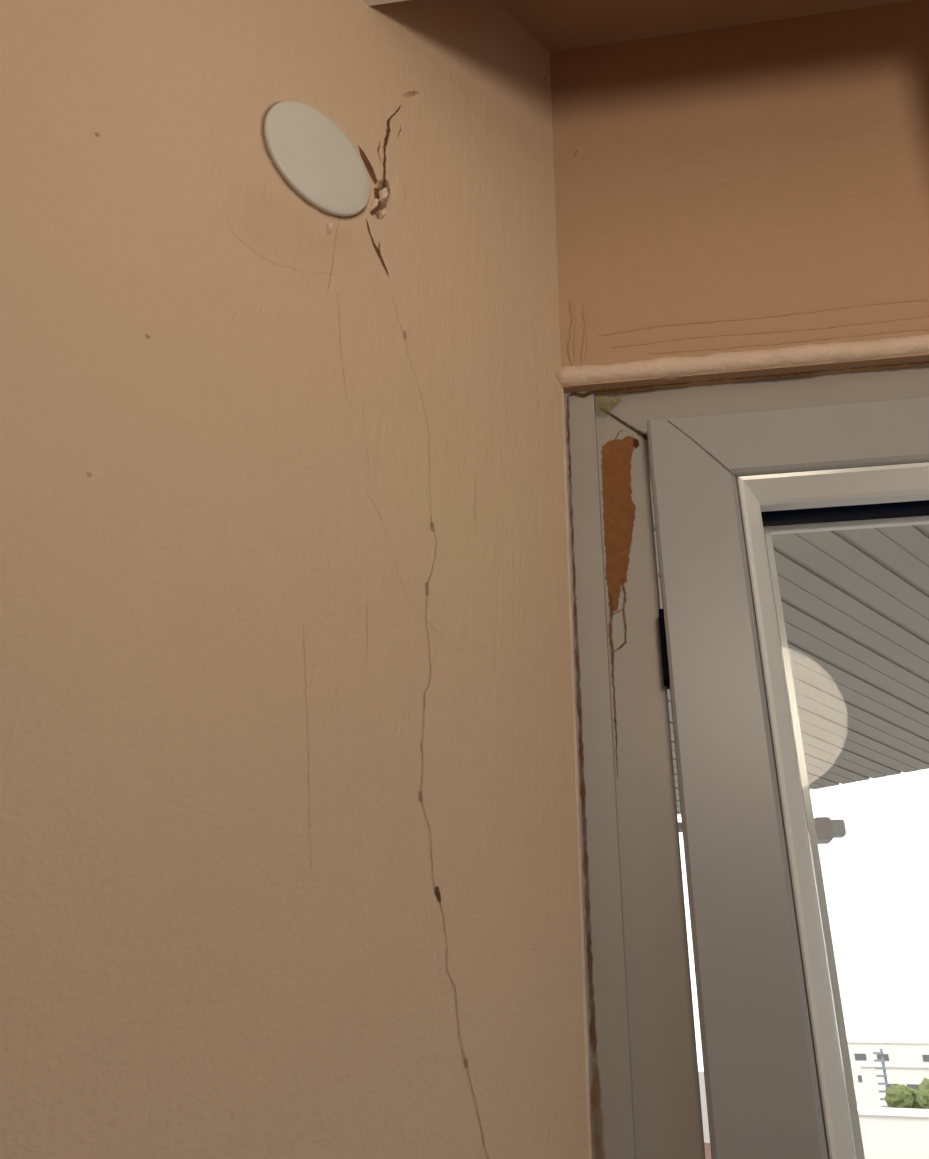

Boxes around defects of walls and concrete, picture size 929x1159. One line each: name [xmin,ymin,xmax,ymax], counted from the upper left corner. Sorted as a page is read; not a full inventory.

crack [366,105,401,275]
peeling [601,431,639,777]
crack [434,887,442,902]